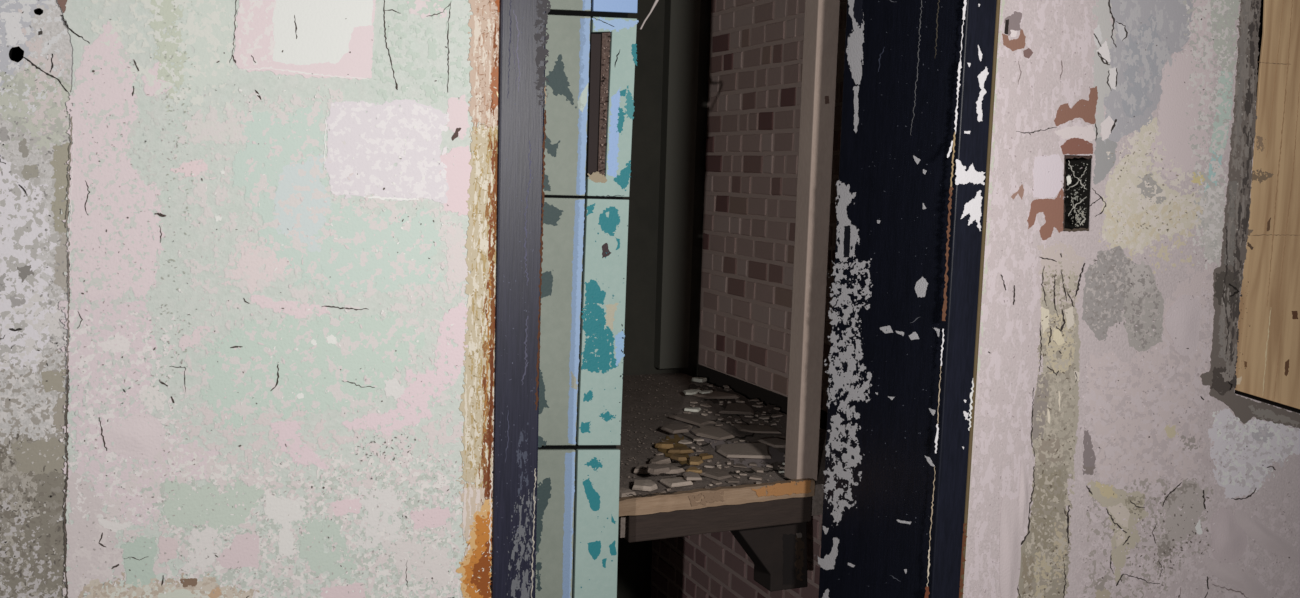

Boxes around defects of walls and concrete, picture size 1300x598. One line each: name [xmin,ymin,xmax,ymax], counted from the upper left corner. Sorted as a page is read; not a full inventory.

peeling [846,0,864,133]
peeling [0,0,499,598]
corrosion [456,0,500,598]
peeling [818,180,895,570]
peeling [880,325,919,340]
peeling [915,277,928,297]
spalling [925,328,944,587]
flaking render [947,0,1300,598]
crack [1063,466,1276,598]